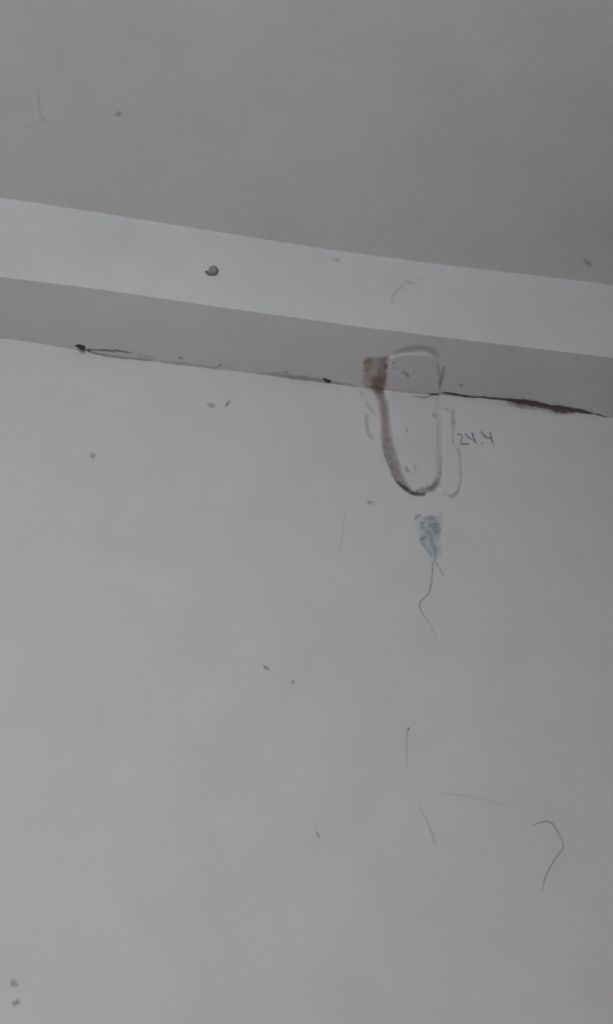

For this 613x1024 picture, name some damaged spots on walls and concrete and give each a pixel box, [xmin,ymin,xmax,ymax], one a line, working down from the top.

crack [75,343,119,351]
crack [430,392,605,417]
damp [380,396,437,495]